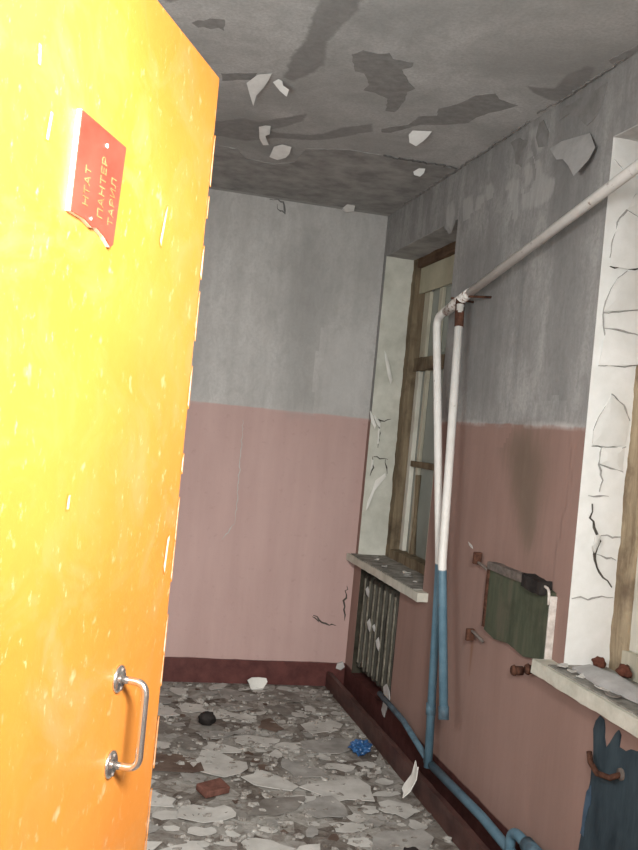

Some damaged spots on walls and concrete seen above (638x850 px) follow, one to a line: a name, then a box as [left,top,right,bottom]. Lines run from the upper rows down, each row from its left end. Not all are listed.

flaking render [221,0,373,105]
flaking render [352,50,415,112]
flaking render [206,93,518,219]
peeling [444,120,595,234]
peeling [614,137,638,169]
peeling [604,192,638,312]
peeling [599,329,638,366]
crack [370,419,390,475]
crack [572,394,630,600]
peeling [592,395,629,471]
crack [312,587,348,626]
peeling [578,716,638,850]